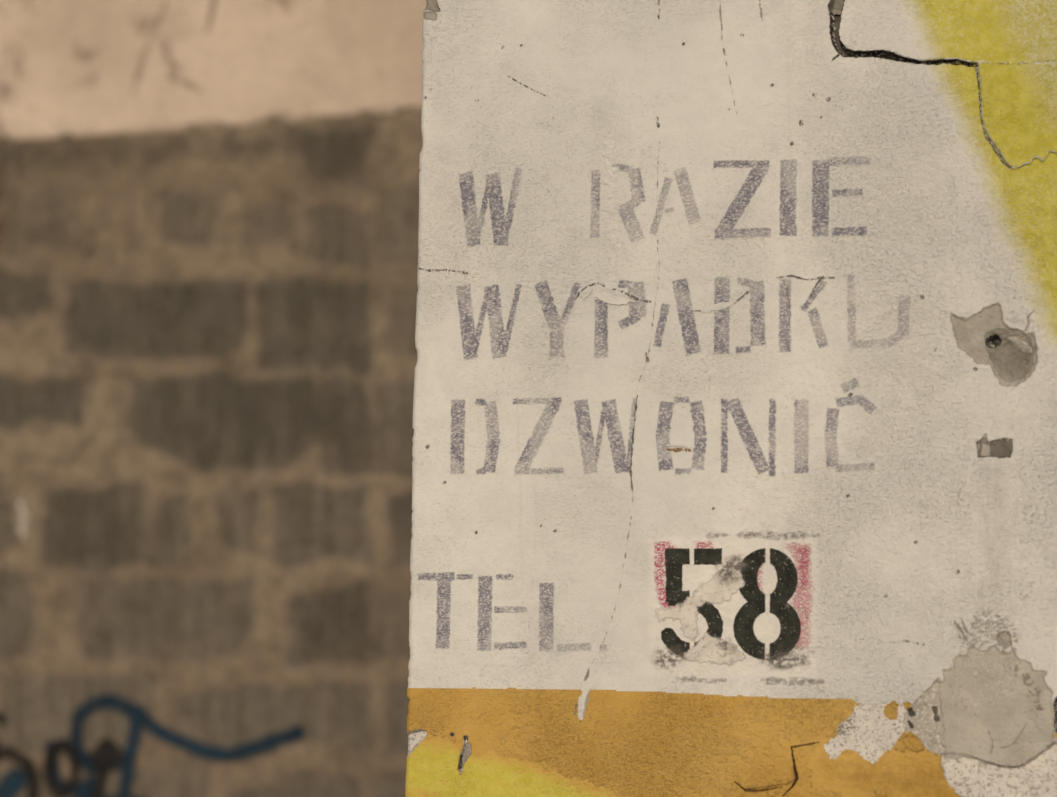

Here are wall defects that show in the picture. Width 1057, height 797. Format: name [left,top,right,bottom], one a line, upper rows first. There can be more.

crack [828,0,1025,169]
peeling [585,96,637,310]
spalling [950,302,1038,387]
spalling [976,434,1013,458]
spalling [823,610,1057,797]